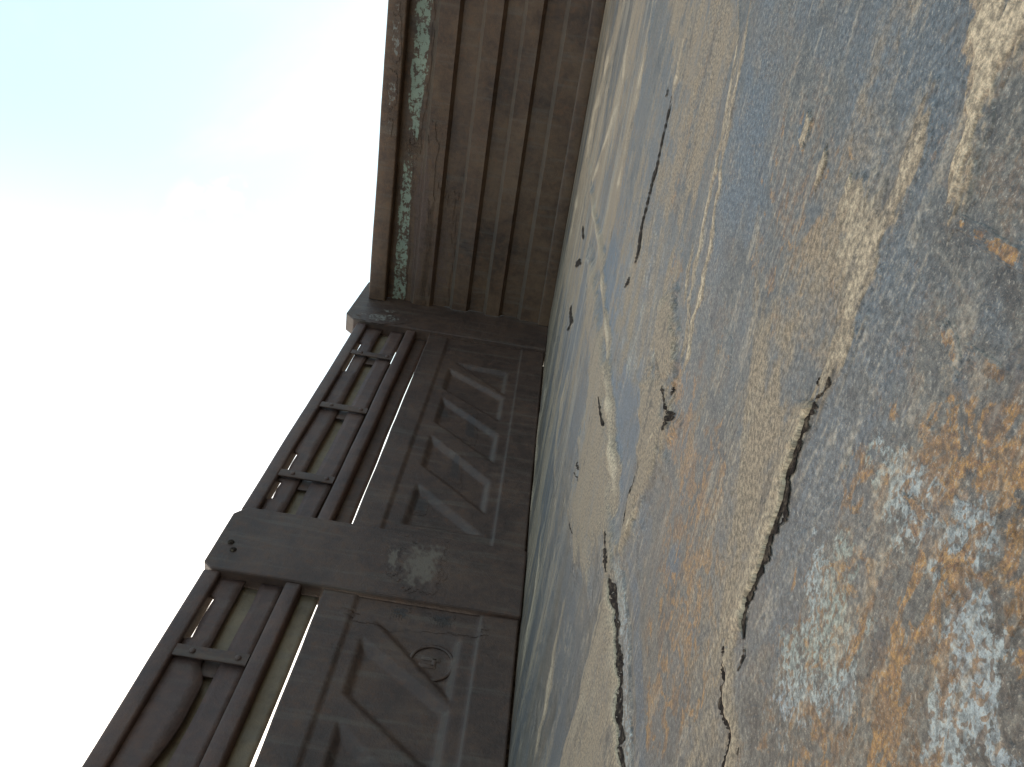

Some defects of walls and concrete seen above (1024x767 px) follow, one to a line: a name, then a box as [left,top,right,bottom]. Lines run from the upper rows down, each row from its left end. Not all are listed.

peeling [355,0,435,324]
crack [624,87,672,288]
crack [597,397,605,426]
crack [597,476,635,767]
crack [718,376,831,767]